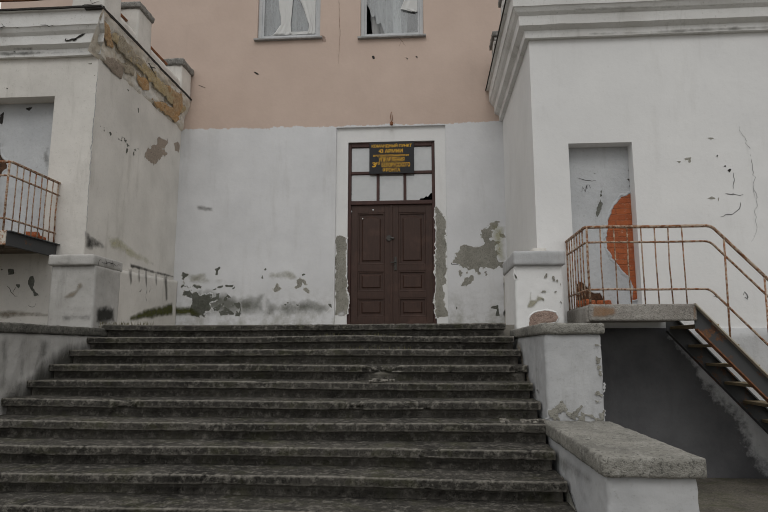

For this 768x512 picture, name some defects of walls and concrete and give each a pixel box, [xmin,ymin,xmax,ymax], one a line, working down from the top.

flaking render [87,6,186,123]
flaking render [100,126,180,168]
crack [721,130,758,237]
flaking render [179,266,242,321]
peeling [272,273,311,295]
flaking render [328,234,350,317]
flaking render [433,206,506,319]
flaking render [595,169,638,303]
flaking render [520,344,606,423]